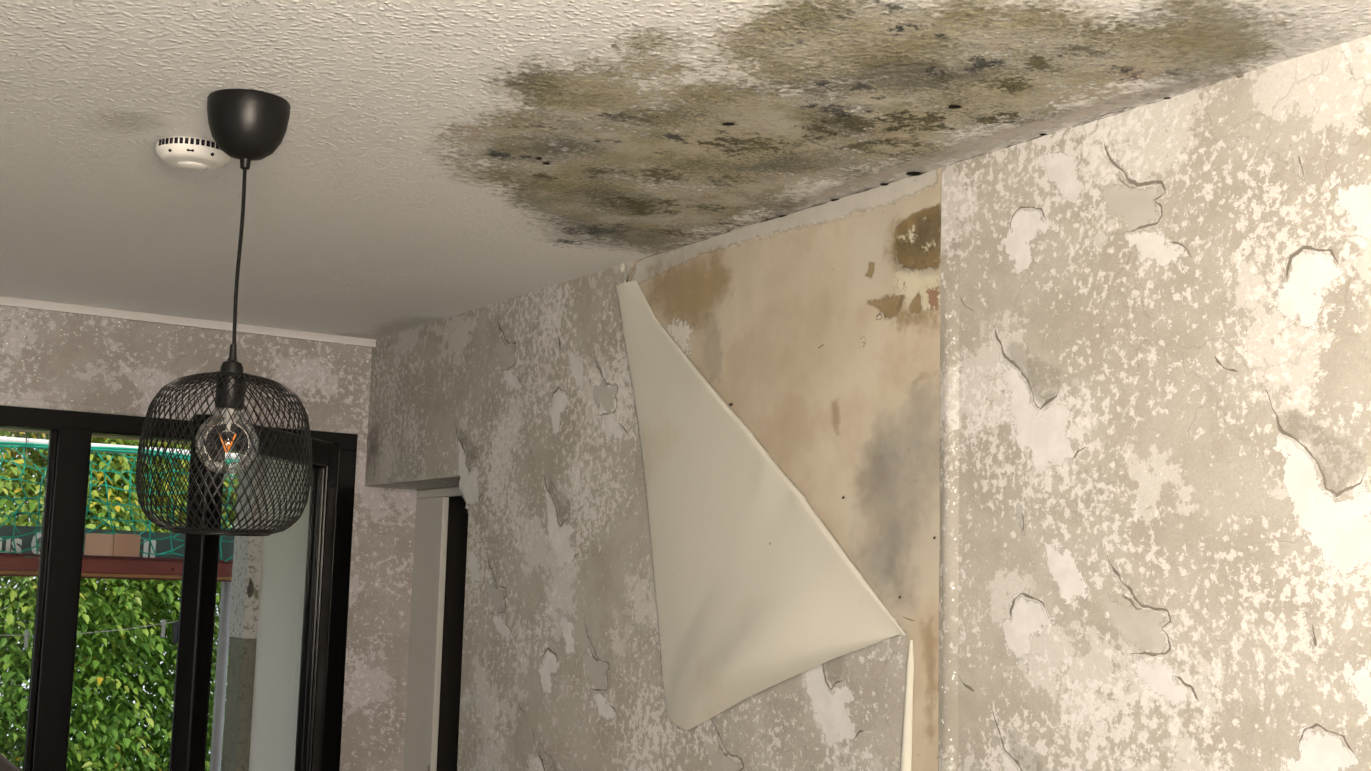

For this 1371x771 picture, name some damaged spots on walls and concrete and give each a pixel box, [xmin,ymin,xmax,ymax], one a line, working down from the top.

mould [434,0,1294,254]
water stain [892,205,941,270]
peeling [1040,136,1191,268]
water stain [868,293,925,324]
peeling [1276,243,1345,331]
peeling [548,351,628,440]
peeling [991,325,1086,486]
peeling [1265,389,1371,588]
peeling [1002,542,1199,706]
peeling [804,664,863,756]
peeling [1280,719,1361,771]
peeling [1342,658,1371,716]